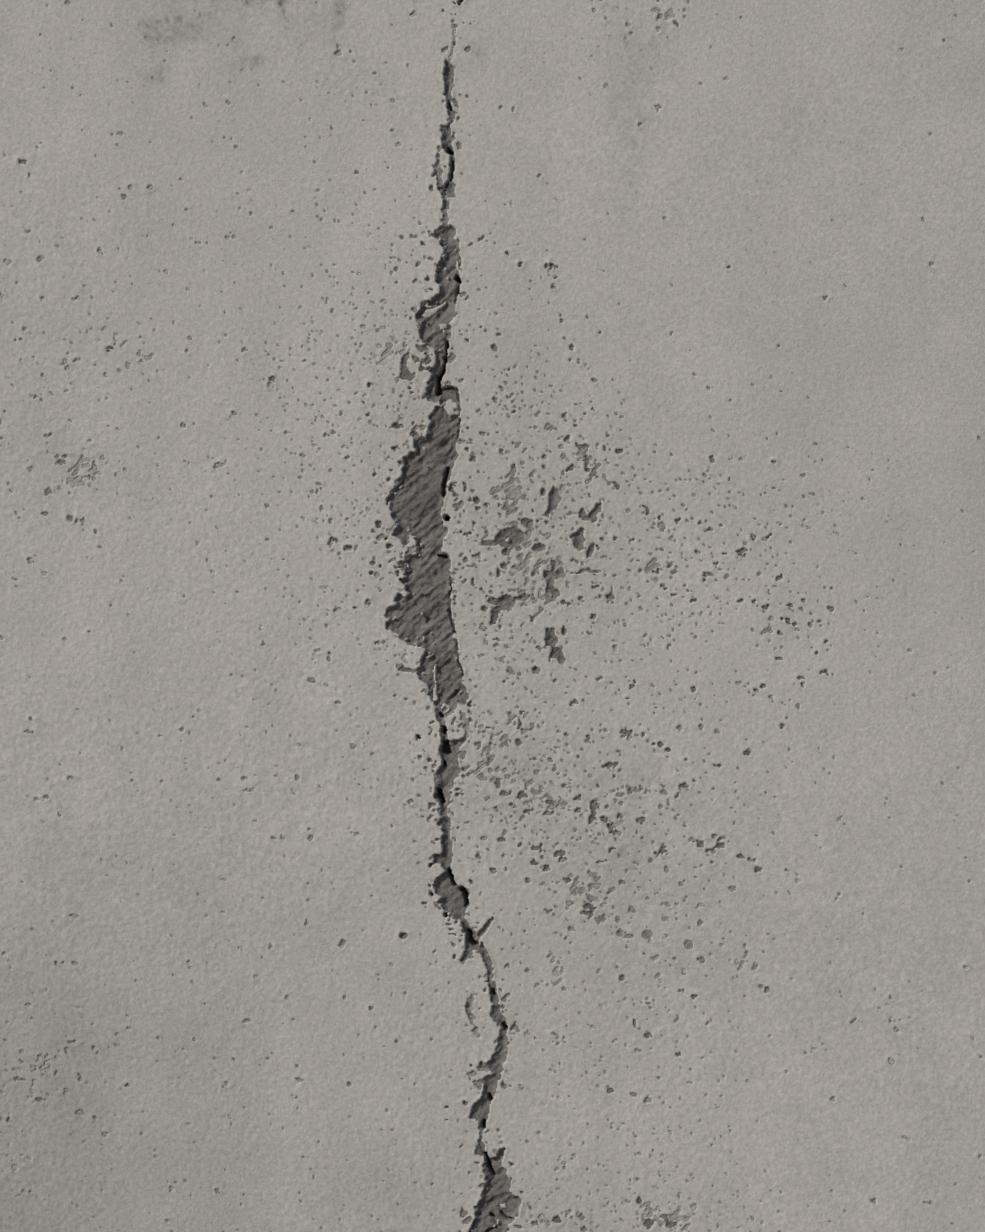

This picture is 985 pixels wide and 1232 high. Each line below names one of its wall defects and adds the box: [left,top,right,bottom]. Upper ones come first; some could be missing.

crack [390,0,510,521]
hole [652,0,690,39]
hole [0,1015,134,1103]
crack [372,529,532,1232]
spalling [208,180,839,1232]